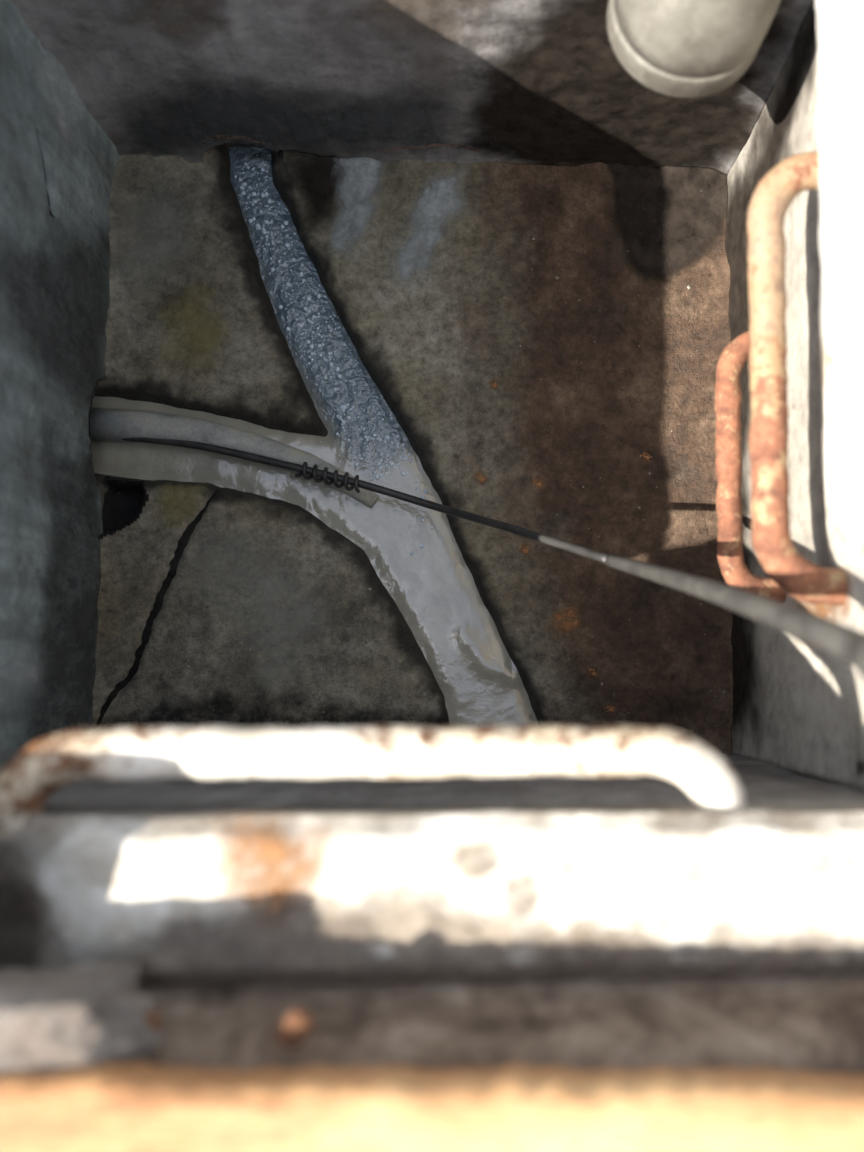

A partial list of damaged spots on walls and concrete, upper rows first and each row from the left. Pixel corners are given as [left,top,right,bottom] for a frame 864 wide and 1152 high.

damp [466,0,819,342]
hole [98,476,149,542]
crack [93,490,219,728]
damp [731,611,757,730]
damp [740,360,751,569]